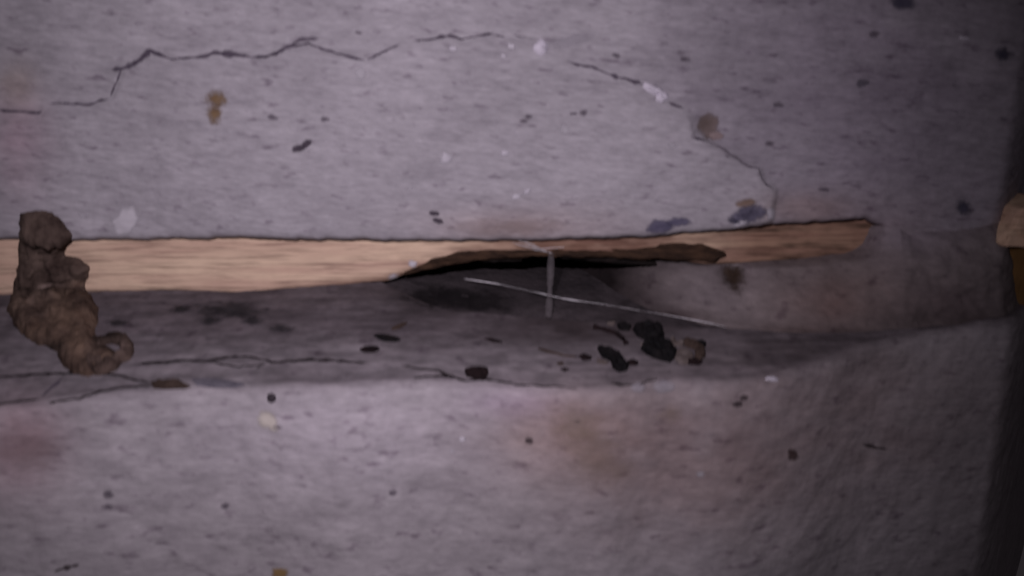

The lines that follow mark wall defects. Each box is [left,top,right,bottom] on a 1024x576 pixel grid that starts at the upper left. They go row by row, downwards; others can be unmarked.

crack [0,33,526,114]
rust [209,94,226,122]
spalling [112,207,138,235]
spalling [723,266,742,290]
crack [0,355,369,405]